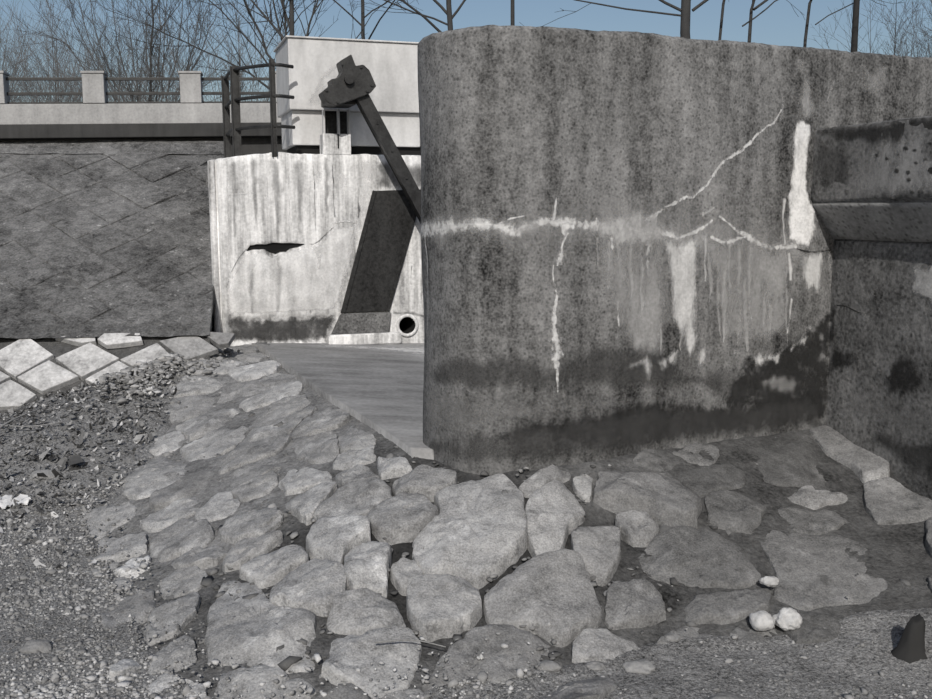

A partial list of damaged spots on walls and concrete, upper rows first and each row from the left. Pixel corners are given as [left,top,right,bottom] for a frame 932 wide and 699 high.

water stain [822,118,932,143]
crack [420,110,831,268]
crack [227,237,323,285]
water stain [526,86,815,392]
water stain [803,254,822,289]
flaking render [913,266,932,300]
water stain [880,358,921,394]
water stain [468,401,818,460]